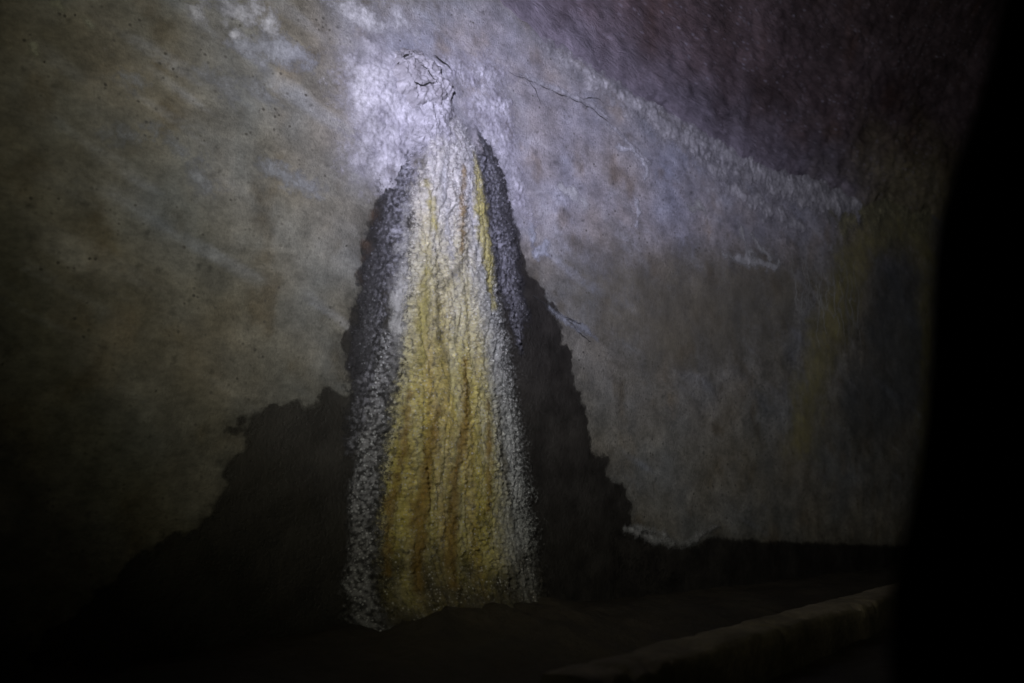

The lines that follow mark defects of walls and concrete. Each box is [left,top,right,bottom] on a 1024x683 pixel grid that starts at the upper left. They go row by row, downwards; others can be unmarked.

water stain [28,36,900,671]
crack [511,73,622,135]